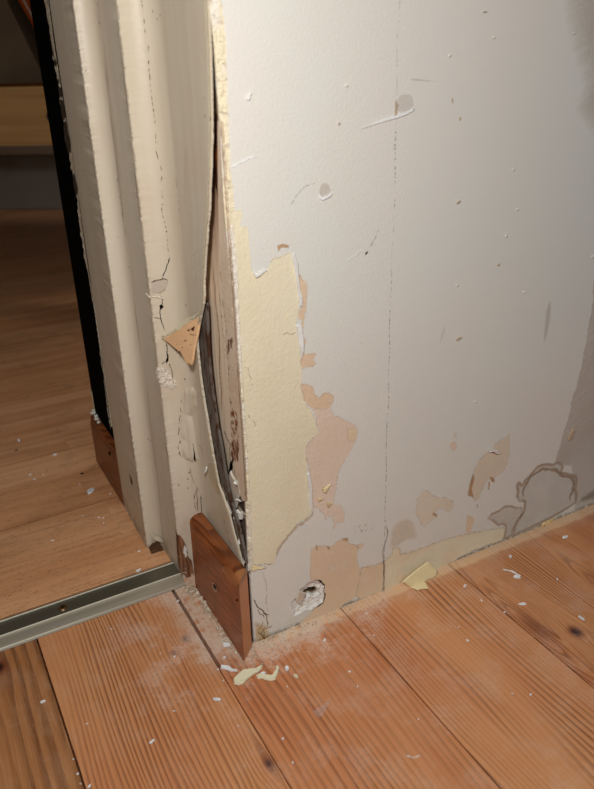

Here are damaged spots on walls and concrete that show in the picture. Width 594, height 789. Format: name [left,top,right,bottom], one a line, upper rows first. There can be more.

peeling [209,0,358,571]
crack [154,299,174,383]
peeling [468,435,510,508]
leakage [488,461,594,540]